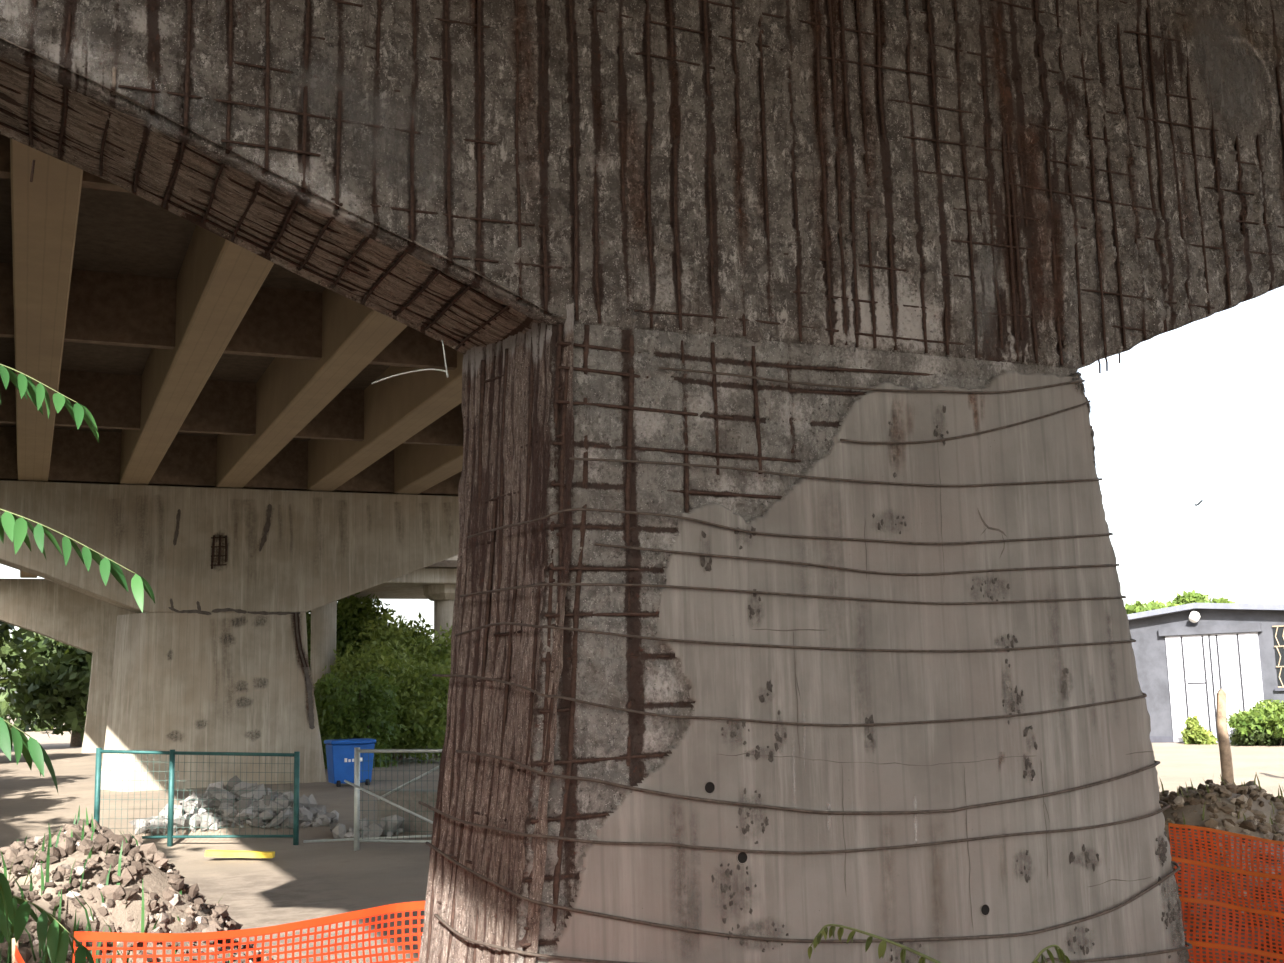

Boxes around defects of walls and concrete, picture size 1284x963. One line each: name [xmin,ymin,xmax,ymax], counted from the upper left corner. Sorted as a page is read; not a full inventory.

spalling [0,36,69,73]
rust [810,0,883,192]
spalling [0,57,542,355]
spalling [560,511,680,585]
peeling [700,556,712,572]
spalling [558,586,664,637]
spalling [552,698,690,787]
peeling [721,710,787,762]
spalling [525,772,632,840]
peeling [736,788,769,844]
spalling [418,837,592,963]
peeling [711,863,788,952]